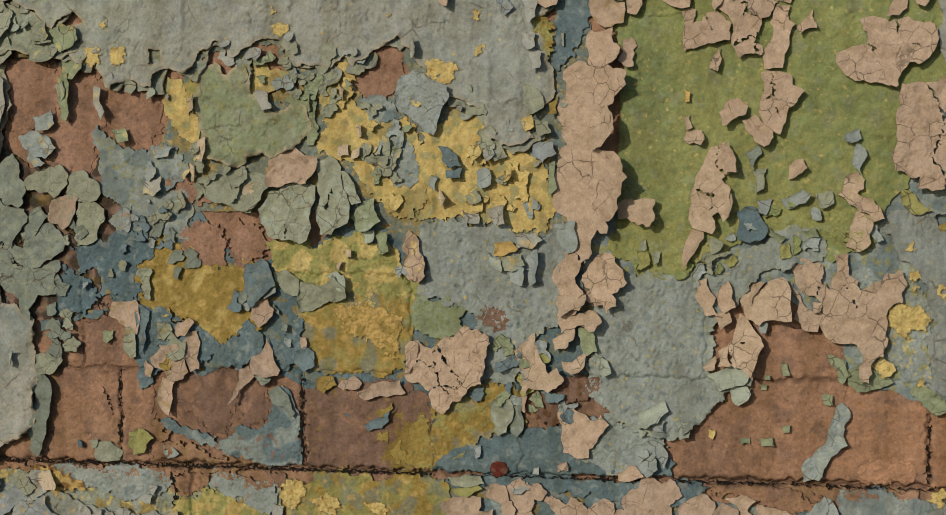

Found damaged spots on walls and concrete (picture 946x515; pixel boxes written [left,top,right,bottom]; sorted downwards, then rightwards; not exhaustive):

flaking render [0,0,661,515]
flaking render [440,0,946,515]